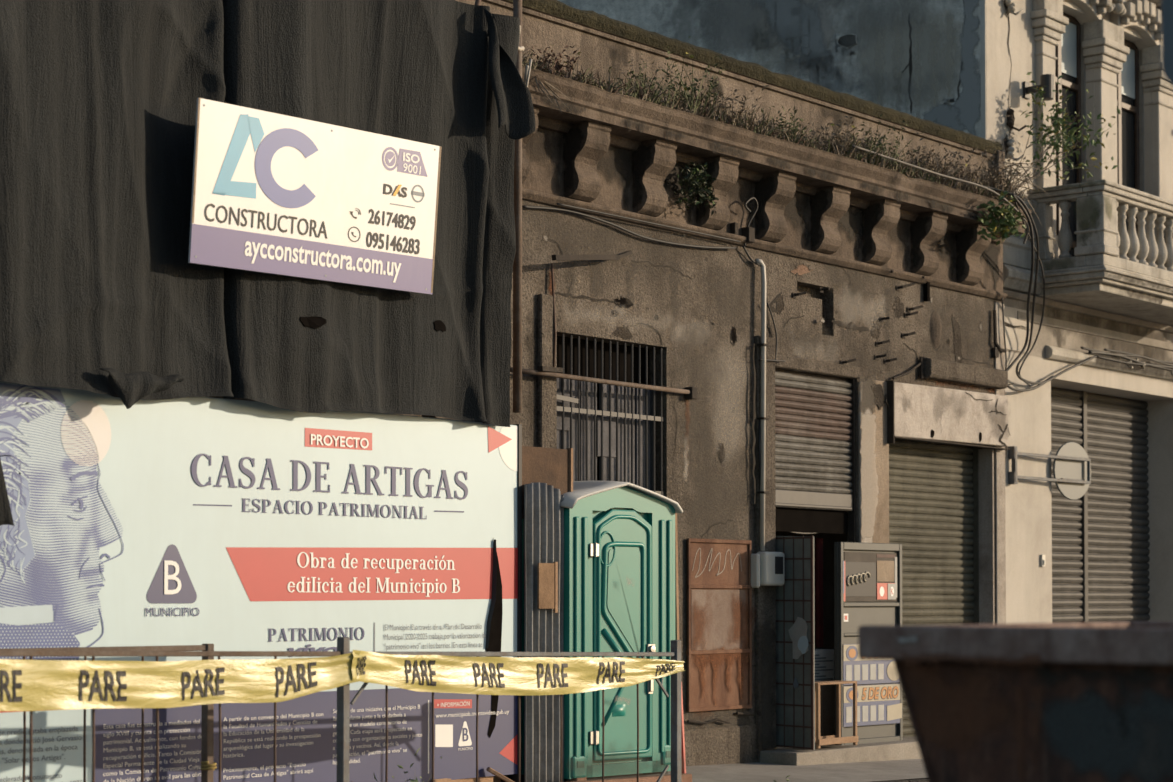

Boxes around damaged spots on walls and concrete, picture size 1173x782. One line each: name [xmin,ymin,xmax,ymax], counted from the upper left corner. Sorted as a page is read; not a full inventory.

crack [901,14,912,113]